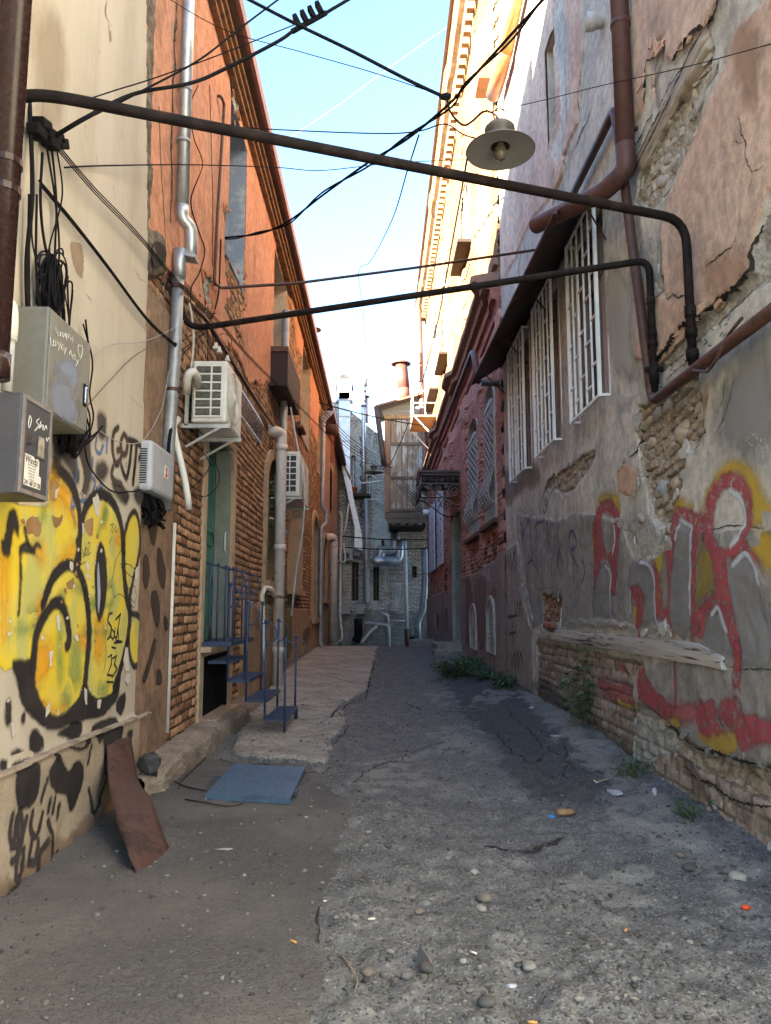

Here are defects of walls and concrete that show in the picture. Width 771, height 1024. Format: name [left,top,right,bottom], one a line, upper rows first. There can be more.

spalling [636,45,719,209]
crack [735,117,764,196]
flaking render [615,208,771,562]
spalling [545,450,596,497]
spalling [516,505,672,637]
crack [496,705,583,781]